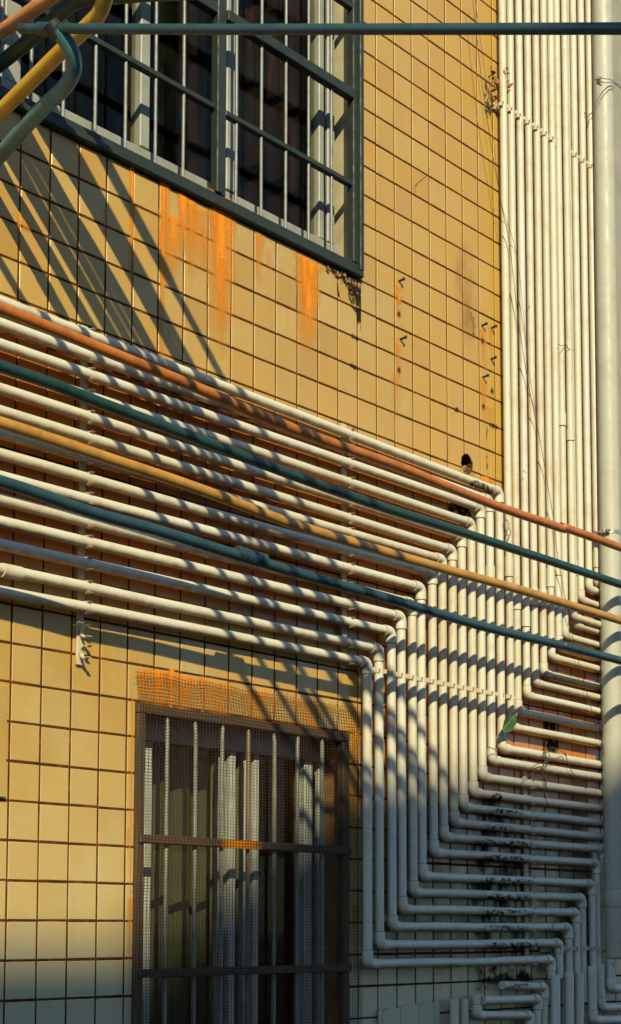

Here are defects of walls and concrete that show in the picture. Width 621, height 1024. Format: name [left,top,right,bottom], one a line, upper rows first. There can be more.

corrosion [160,182,234,316]
corrosion [295,254,321,331]